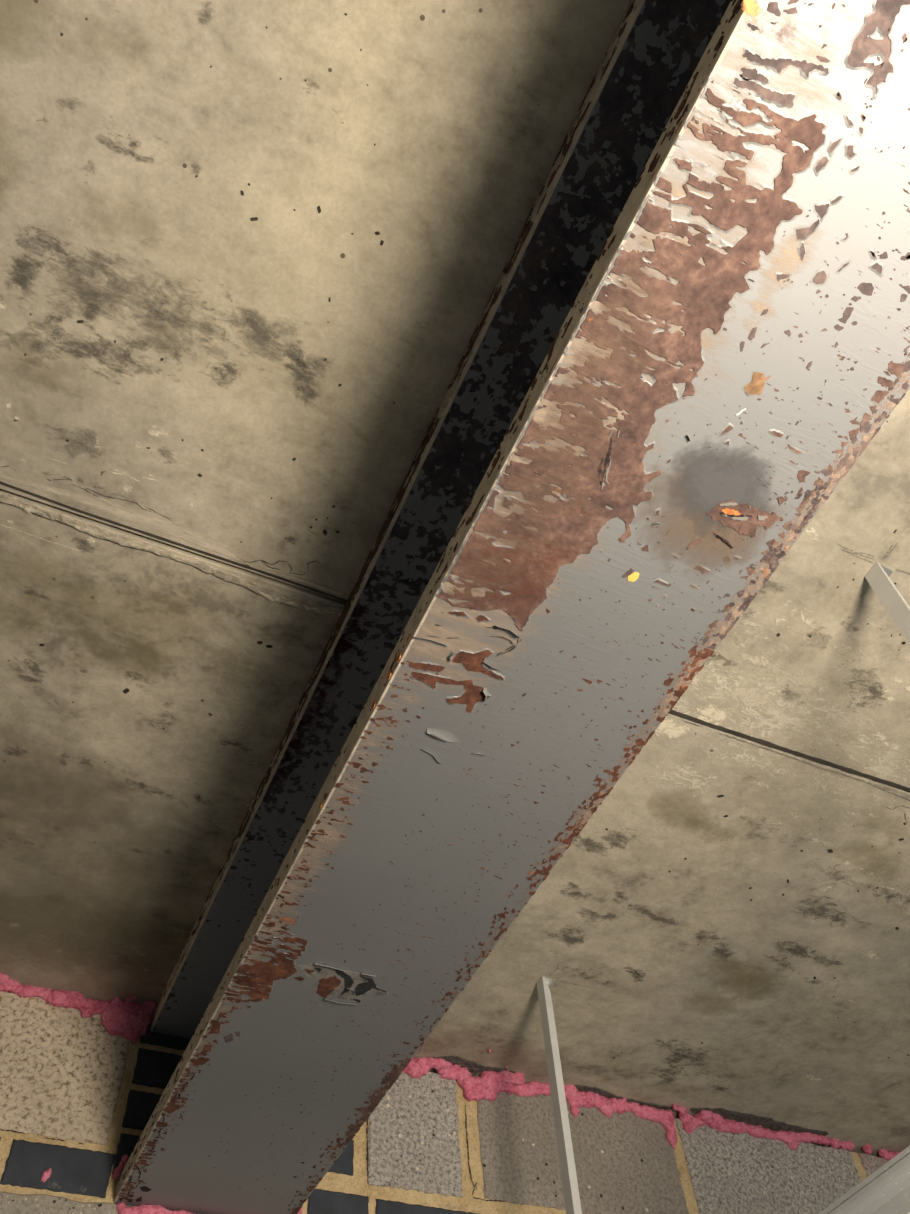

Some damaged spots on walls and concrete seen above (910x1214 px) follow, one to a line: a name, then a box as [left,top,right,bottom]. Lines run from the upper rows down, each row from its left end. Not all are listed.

rust [634,0,760,188]
leakage [69,254,127,319]
leakage [236,310,320,395]
rust [153,0,637,1019]
peeling [0,0,910,927]
rust [116,631,424,1201]
leakage [555,929,583,944]
rust [288,345,910,1214]
leakage [579,834,627,851]